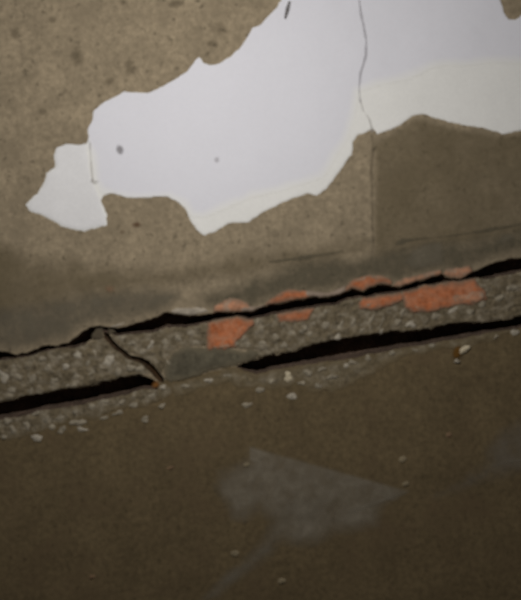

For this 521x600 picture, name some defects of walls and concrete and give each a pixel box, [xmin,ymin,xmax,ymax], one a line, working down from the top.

peeling [26,0,521,235]
crack [0,258,521,420]